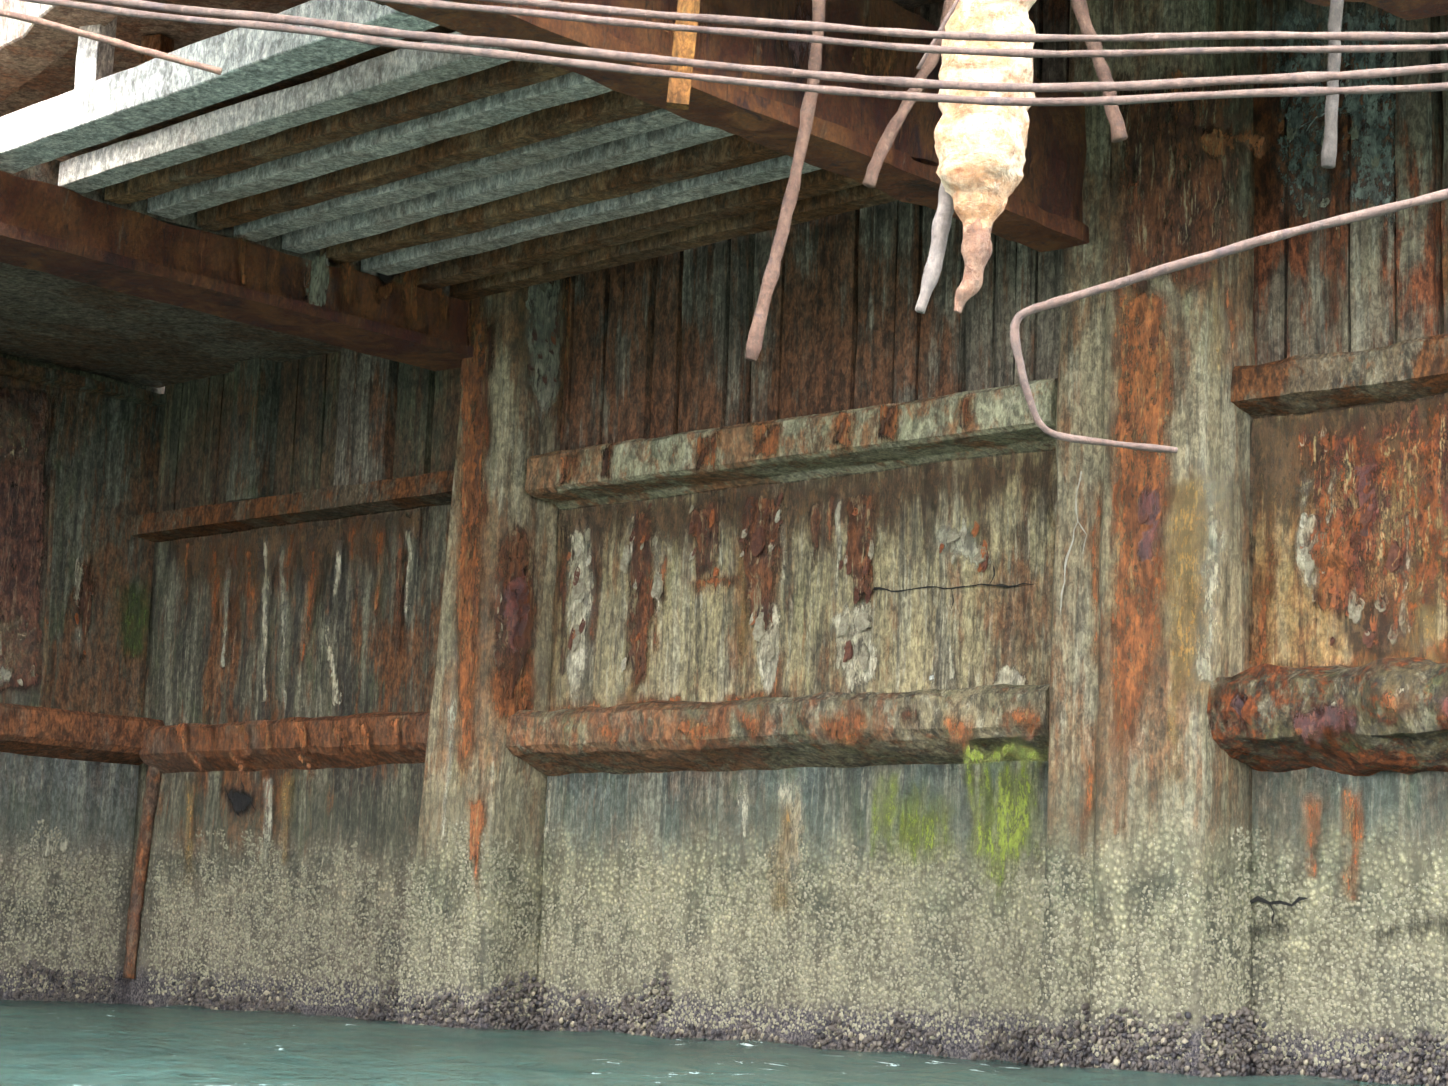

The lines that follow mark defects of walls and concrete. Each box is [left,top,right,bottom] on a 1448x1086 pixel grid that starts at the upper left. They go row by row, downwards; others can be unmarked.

corrosion [781,0,826,69]
corrosion [853,17,907,89]
peeling [1270,0,1448,228]
corrosion [1080,62,1265,855]
corrosion [167,505,427,756]
corrosion [442,296,496,843]
crack [873,471,1087,613]
corrosion [1249,393,1448,668]
corrosion [174,719,269,775]
corrosion [292,718,314,776]
corrosion [468,797,486,882]
crack [1250,895,1307,924]